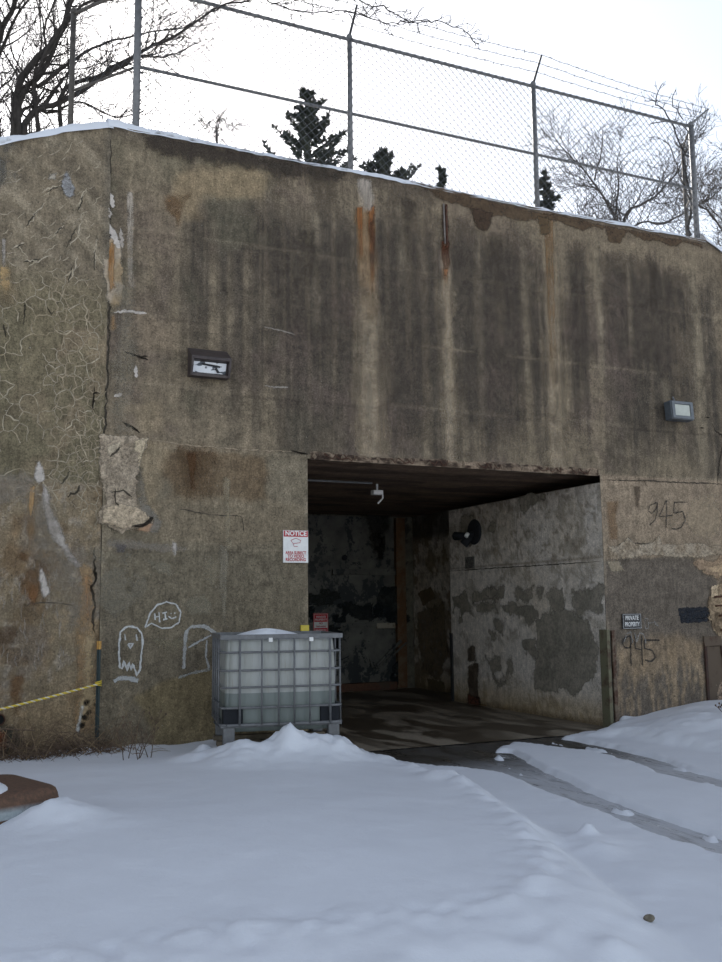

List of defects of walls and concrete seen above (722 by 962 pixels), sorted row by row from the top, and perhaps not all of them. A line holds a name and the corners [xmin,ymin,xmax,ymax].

water stain [146,133,345,180]
water stain [108,192,133,248]
corrosion [354,178,376,274]
water stain [418,183,702,248]
crack [0,185,308,632]
spalling [98,434,153,534]
peeling [608,536,722,636]
peeling [308,583,605,695]
peeling [467,645,513,705]